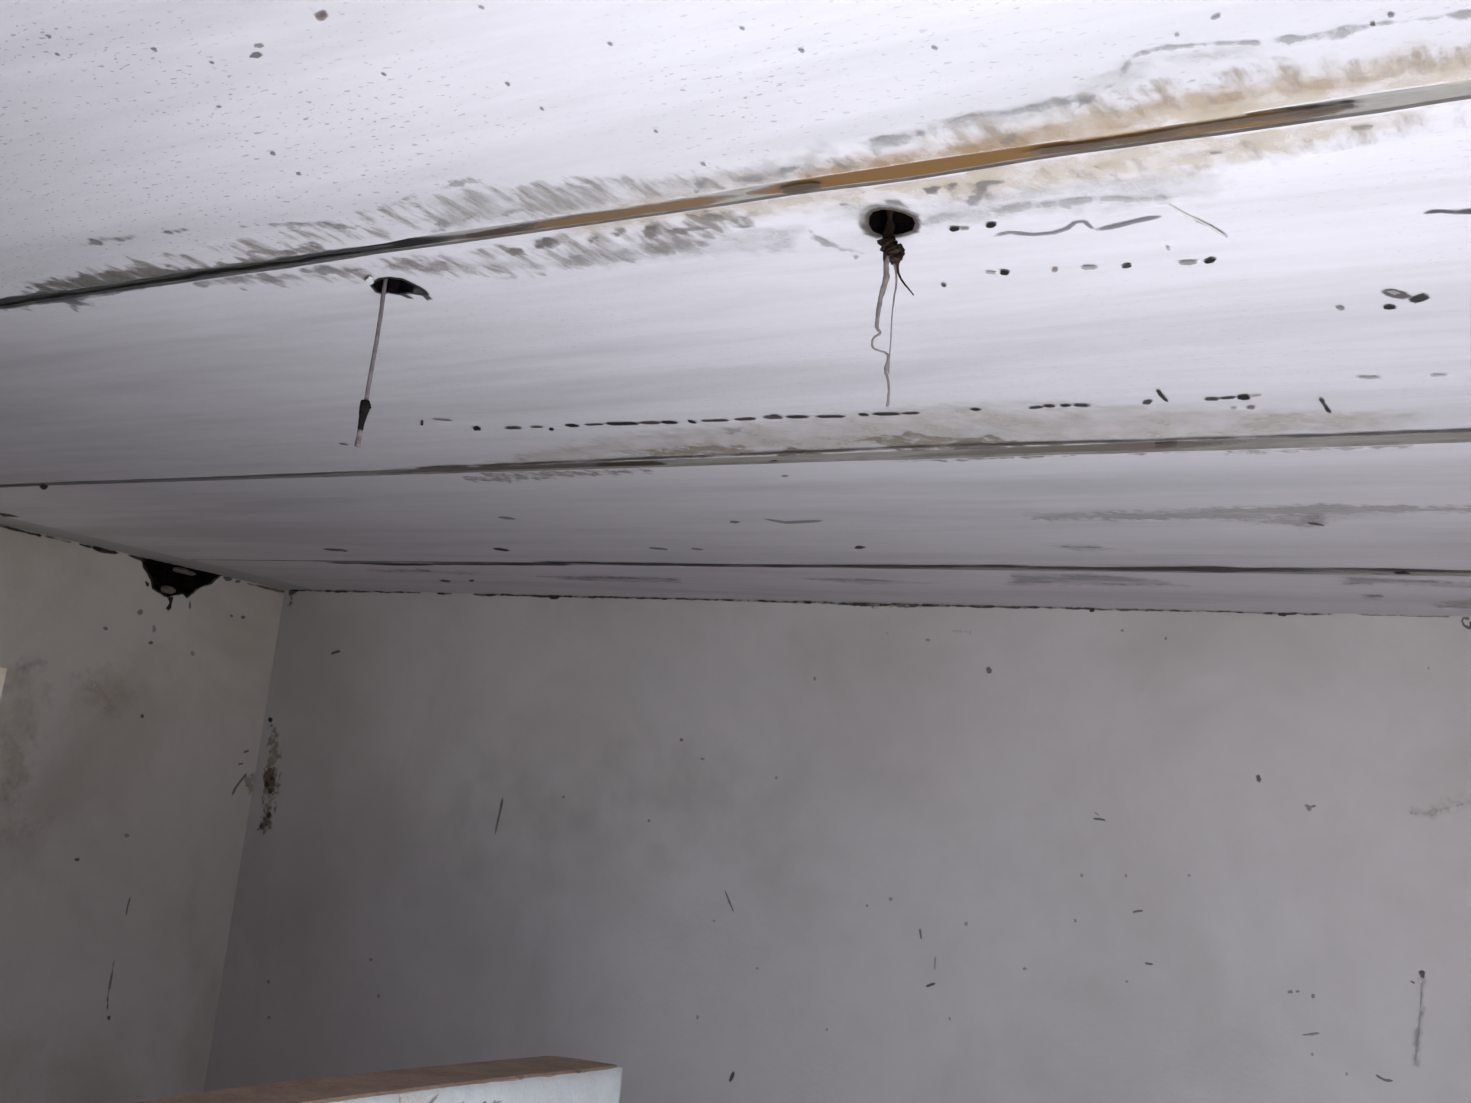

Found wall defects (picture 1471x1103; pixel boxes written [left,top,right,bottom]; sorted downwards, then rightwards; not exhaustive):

water stain [1330,13,1394,38]
water stain [1451,11,1471,20]
water stain [1123,34,1260,70]
water stain [949,95,1098,140]
water stain [695,163,797,193]
water stain [922,181,1167,225]
crack [1425,208,1471,216]
water stain [23,199,407,311]
water stain [479,210,750,273]
water stain [858,432,1074,462]
hole [141,557,222,611]
water stain [232,717,281,835]